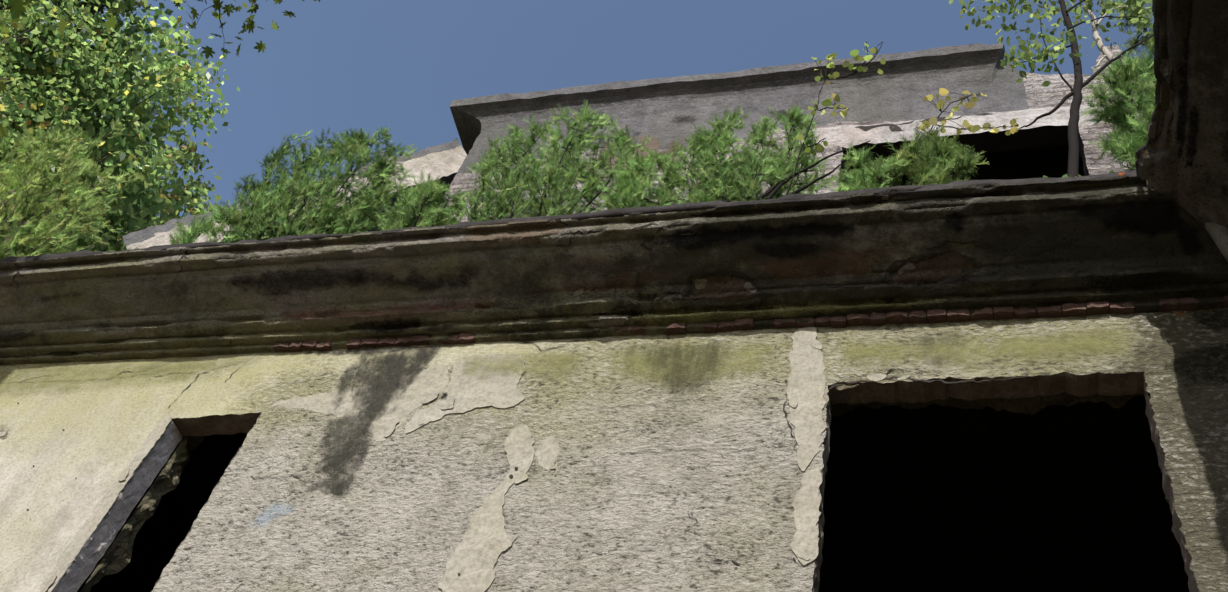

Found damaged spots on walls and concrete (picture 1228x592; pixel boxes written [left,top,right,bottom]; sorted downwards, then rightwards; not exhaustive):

leakage [231,268,468,293]
flaking render [666,322,686,335]
flaking render [703,318,754,333]
leakage [307,319,453,495]
peeling [271,332,526,442]
peeling [774,301,1134,566]
peeling [437,425,560,592]